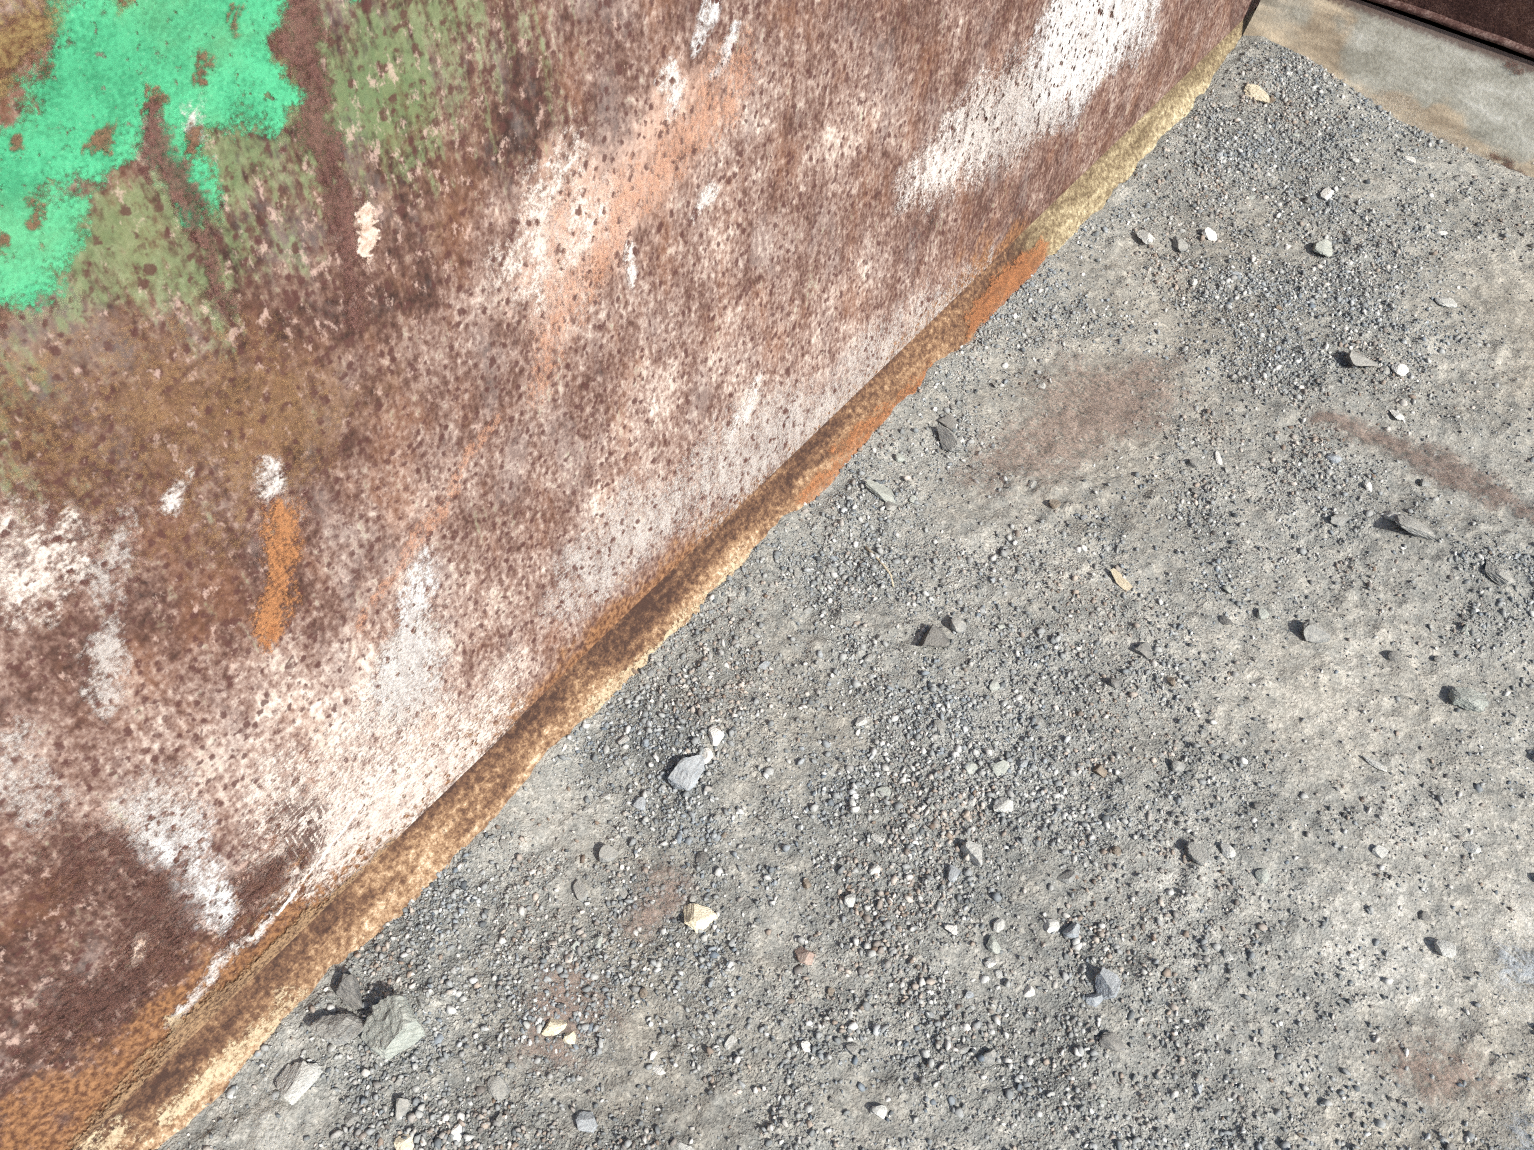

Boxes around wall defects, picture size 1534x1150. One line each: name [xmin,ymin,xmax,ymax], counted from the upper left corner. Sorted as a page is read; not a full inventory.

corrosion [0,0,59,97]
corrosion [192,50,214,85]
corrosion [9,133,25,151]
corrosion [81,123,117,156]
peeling [0,0,306,311]
corrosion [965,239,1049,341]
corrosion [797,363,933,504]
corrosion [980,363,1170,472]
corrosion [254,499,304,653]
corrosion [28,801,200,1059]
corrosion [68,834,401,1150]
corrosion [220,785,331,941]